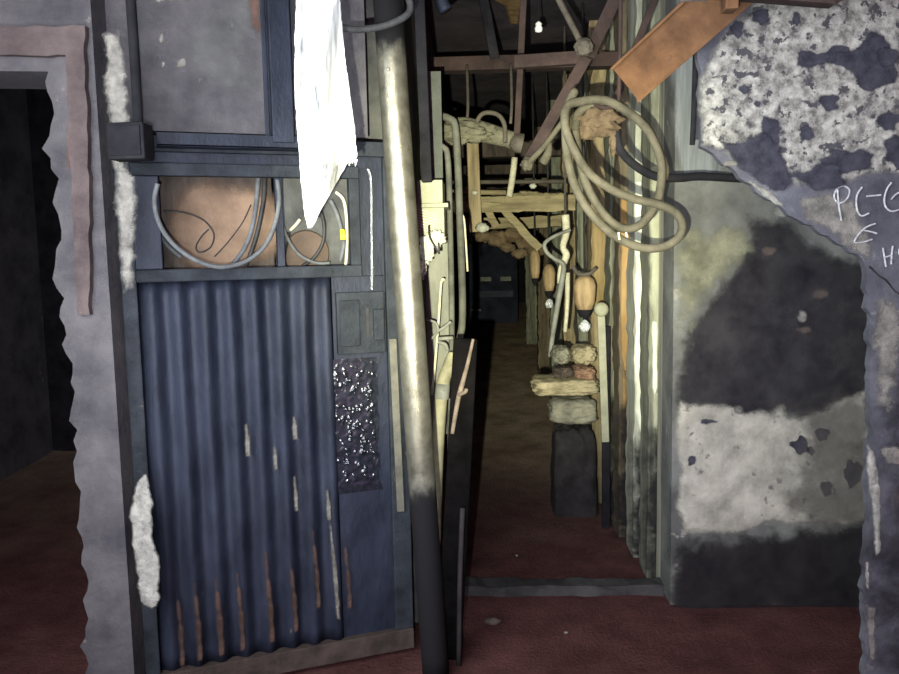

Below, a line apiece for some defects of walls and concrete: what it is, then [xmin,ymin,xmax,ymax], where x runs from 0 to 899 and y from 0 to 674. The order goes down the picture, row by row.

peeling [700,0,899,259]
damp [679,228,750,310]
crack [869,266,899,294]
spalling [130,475,160,608]
flaking render [676,391,899,588]
spalling [867,607,876,660]